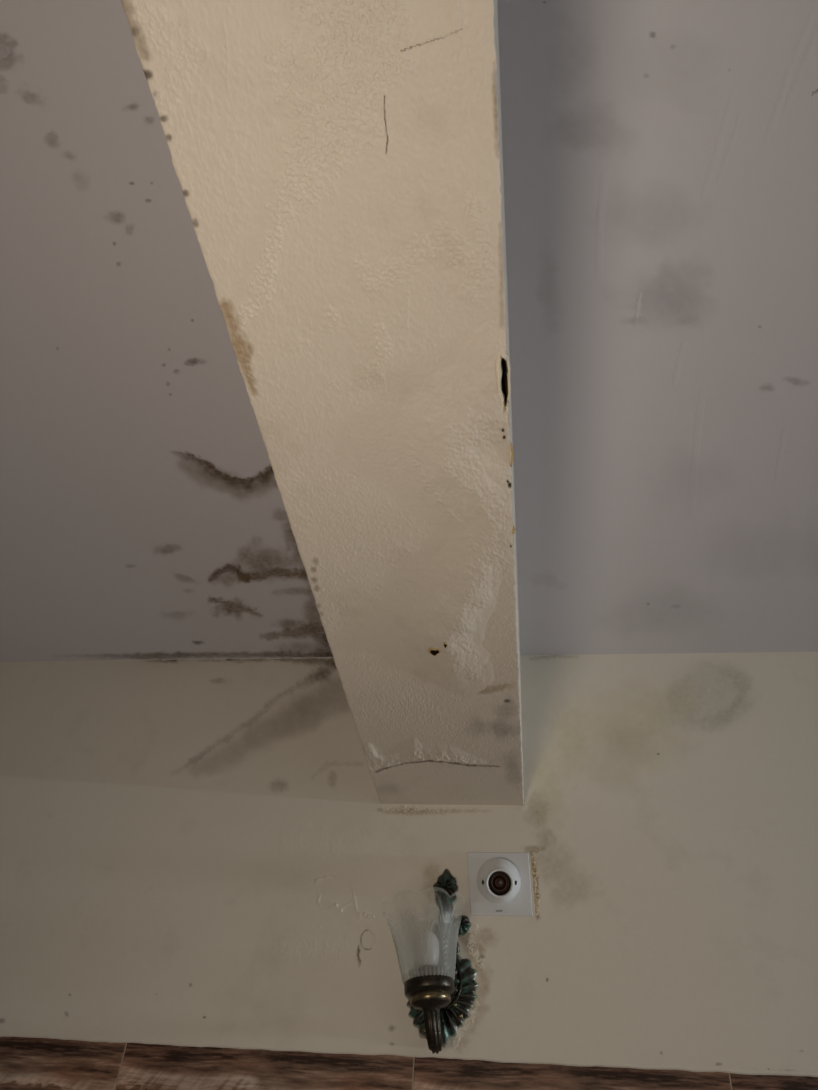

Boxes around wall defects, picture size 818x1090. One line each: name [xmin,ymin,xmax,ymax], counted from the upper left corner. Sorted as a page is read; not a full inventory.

flaking render [495,351,511,413]
damp [188,454,273,486]
damp [213,560,307,582]
damp [529,847,541,917]